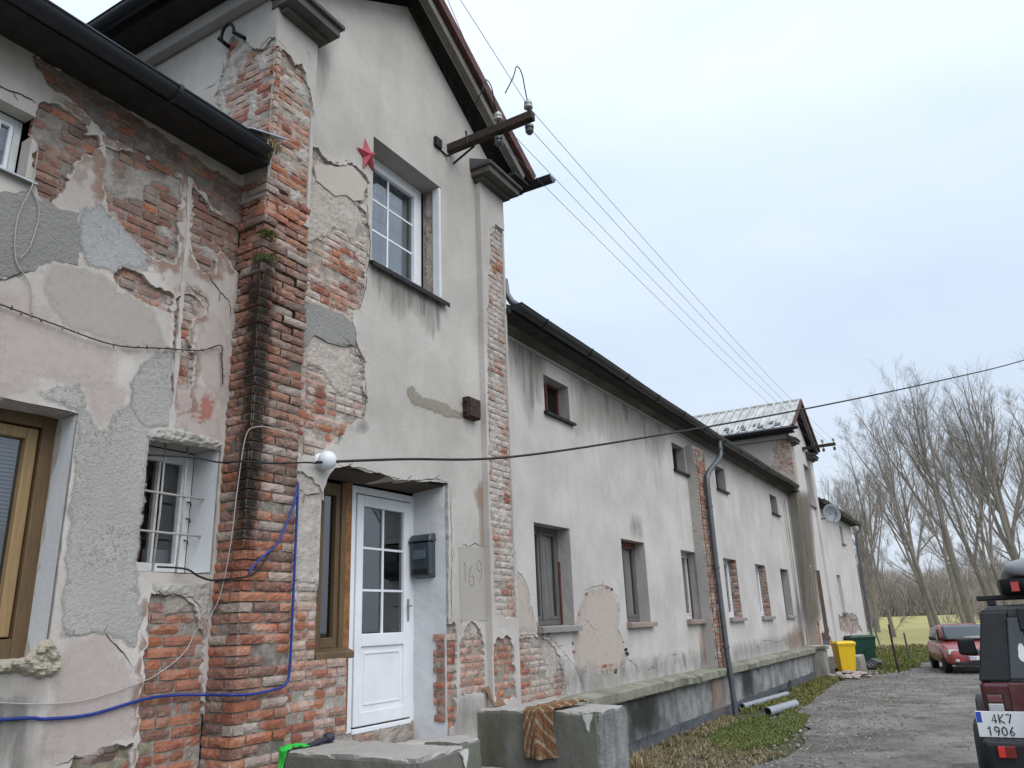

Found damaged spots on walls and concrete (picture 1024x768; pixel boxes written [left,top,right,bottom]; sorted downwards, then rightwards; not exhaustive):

flaking render [28,56,242,273]
crack [187,275,231,316]
flaking render [215,35,368,457]
flaking render [487,222,515,619]
flaking render [771,438,795,476]
flaking render [0,580,212,768]
flaking render [446,622,563,728]
peeling [572,585,629,675]
flaking render [814,613,861,645]